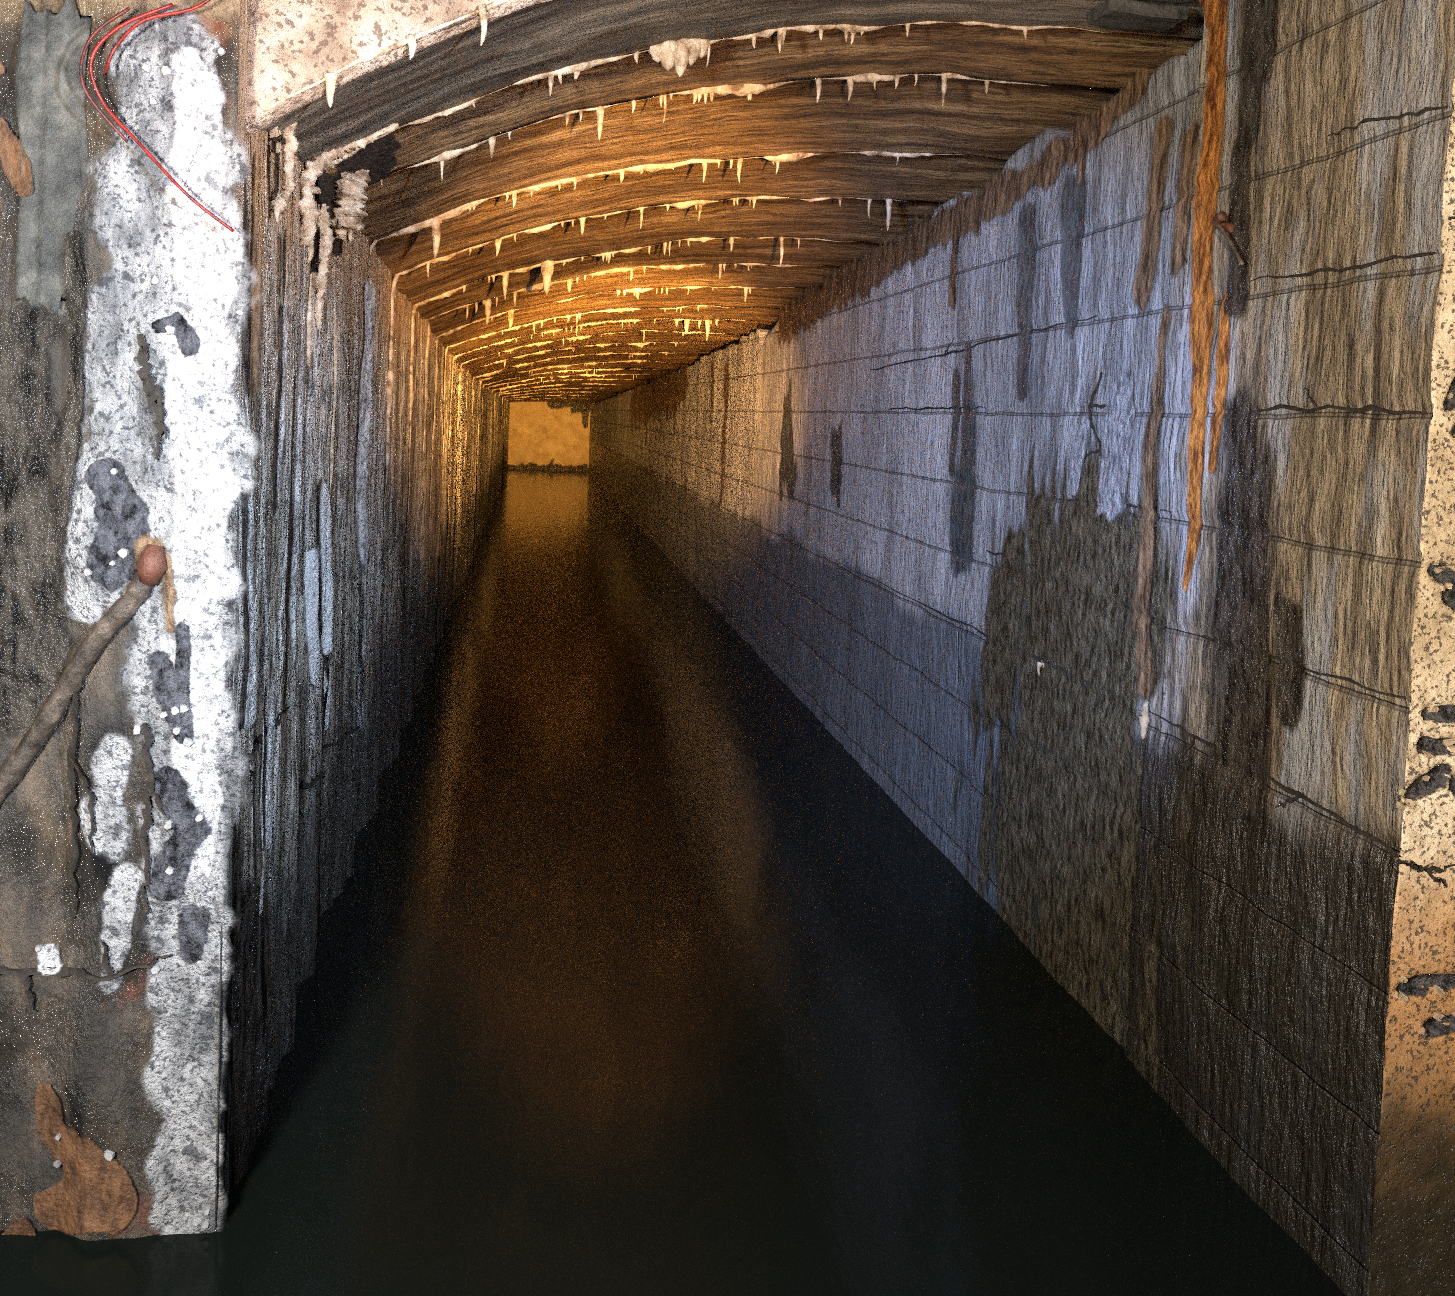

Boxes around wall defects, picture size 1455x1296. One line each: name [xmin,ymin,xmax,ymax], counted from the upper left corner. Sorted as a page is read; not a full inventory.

efflorescence [266,0,511,111]
crack [1328,106,1448,136]
corrosion [1182,0,1229,590]
crack [1251,252,1436,281]
leakage [1116,115,1199,740]
crack [1225,387,1426,415]
leakage [229,21,1147,1200]